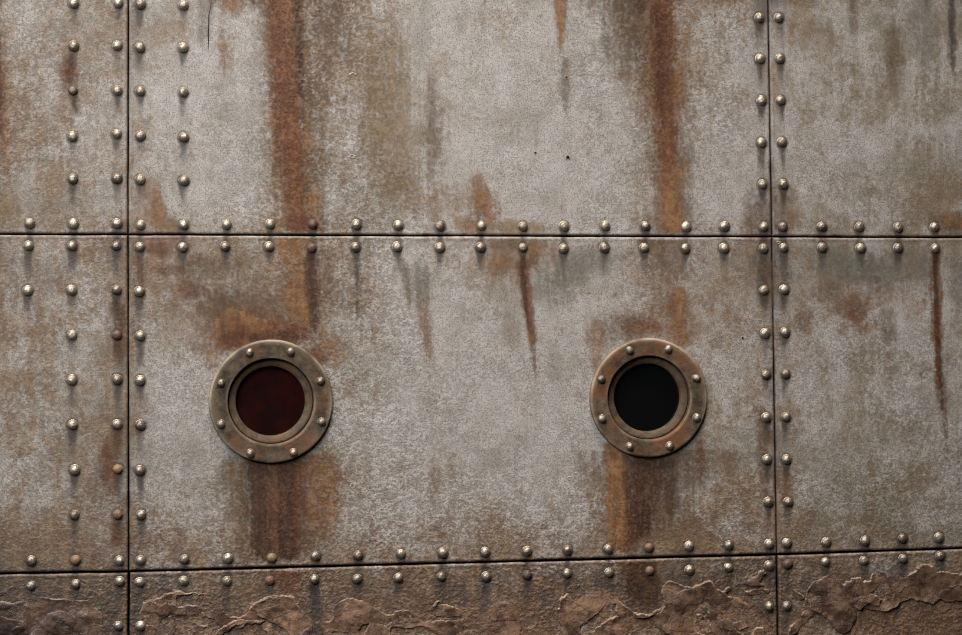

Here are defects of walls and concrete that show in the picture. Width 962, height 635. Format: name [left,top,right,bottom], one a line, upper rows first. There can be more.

rust [204,0,342,366]
rust [459,175,535,233]
rust [614,0,691,343]
rust [482,244,545,360]
rust [929,252,946,413]
rust [237,455,337,561]
rust [593,443,706,551]
rust [139,572,465,635]
rust [558,563,774,635]